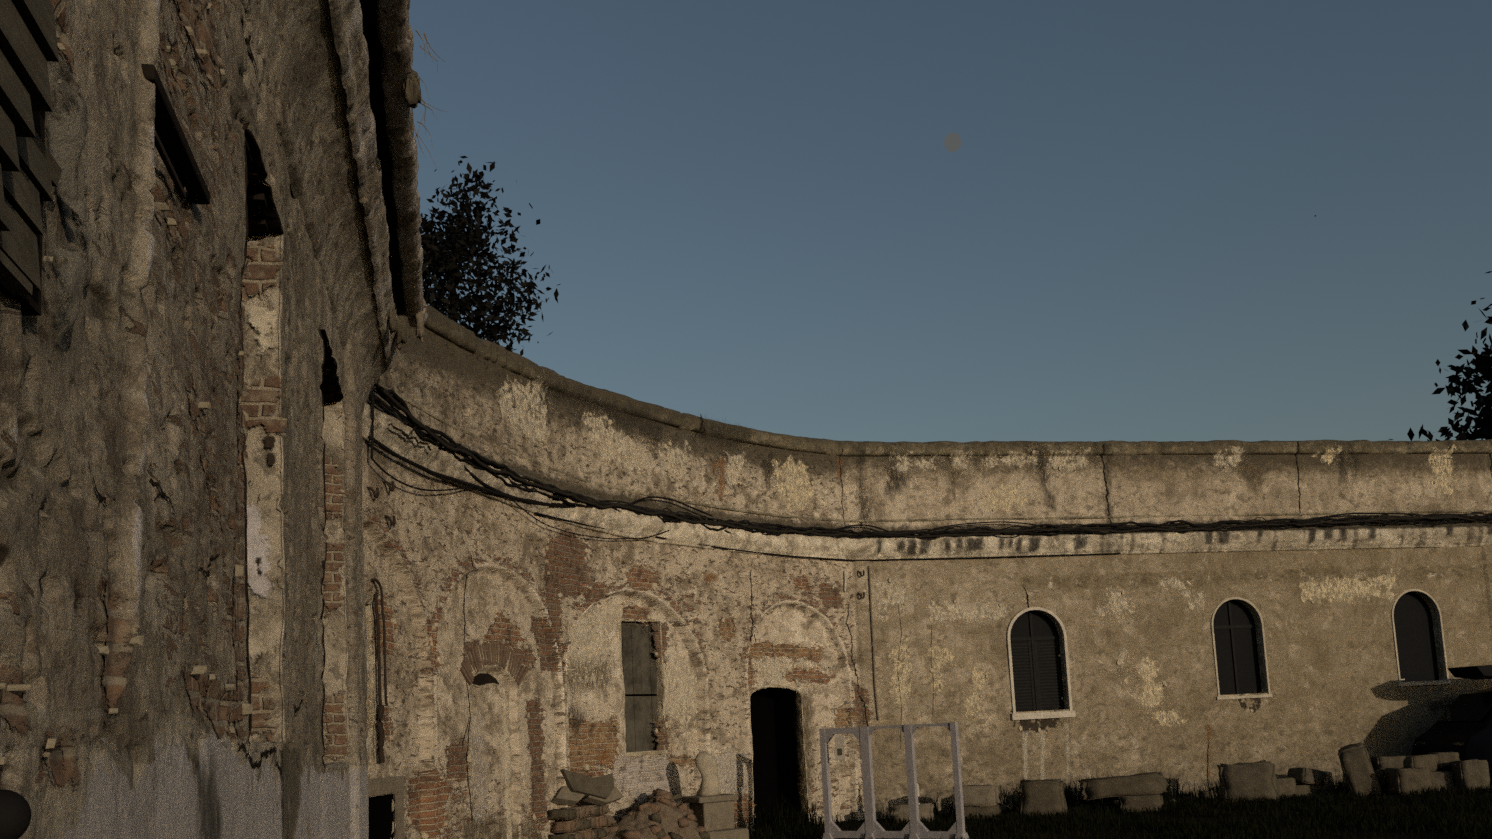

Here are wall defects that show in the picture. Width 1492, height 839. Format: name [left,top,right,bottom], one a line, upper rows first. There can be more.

flaking render [158,0,226,98]
spalling [0,543,10,565]
flaking render [182,238,287,752]
flaking render [322,537,348,619]
flaking render [0,655,82,809]
flaking render [95,570,144,738]
water stain [198,767,220,839]
water stain [283,745,302,839]
flaking render [323,690,350,761]
flaking render [366,594,399,763]
flaking render [407,707,488,839]
flaking render [460,527,757,823]